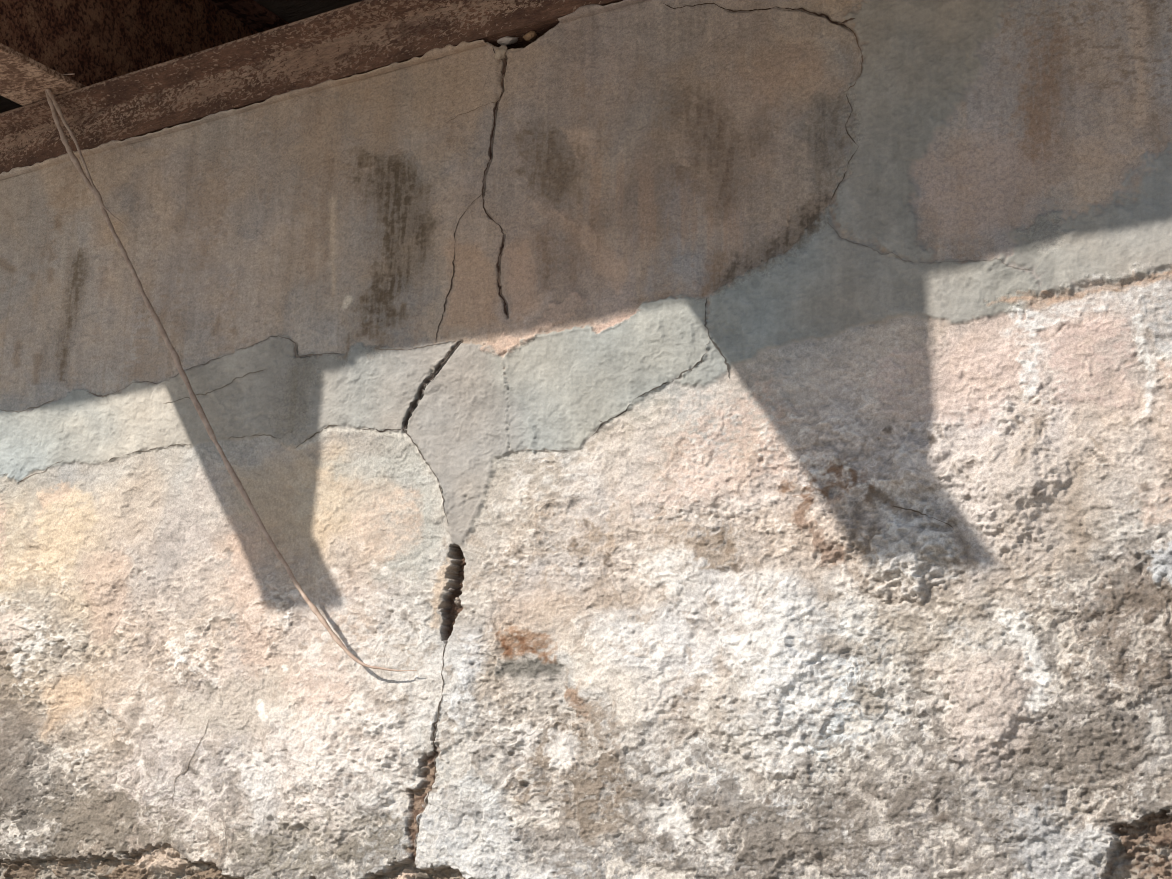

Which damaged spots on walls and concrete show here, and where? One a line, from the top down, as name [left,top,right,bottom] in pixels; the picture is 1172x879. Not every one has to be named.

leakage [266,130,451,457]
leakage [493,98,613,299]
crack [593,298,730,435]
leakage [652,67,866,303]
crack [663,3,1030,270]
spalling [0,837,244,879]
crack [415,644,446,856]
flaking render [359,737,568,879]
flaking render [996,780,1172,879]